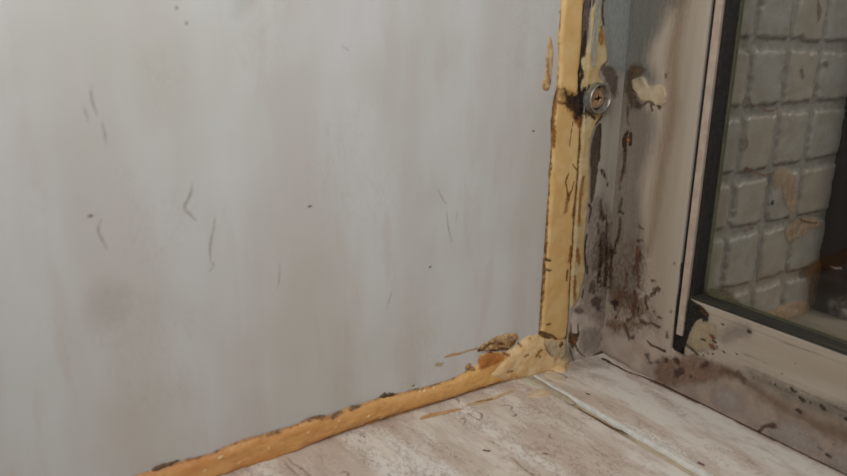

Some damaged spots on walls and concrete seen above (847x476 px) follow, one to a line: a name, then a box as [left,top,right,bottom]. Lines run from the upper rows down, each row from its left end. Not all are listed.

peeling [604,0,675,111]
water stain [562,323,585,361]
water stain [589,197,624,310]
water stain [611,240,661,322]
water stain [645,263,754,385]